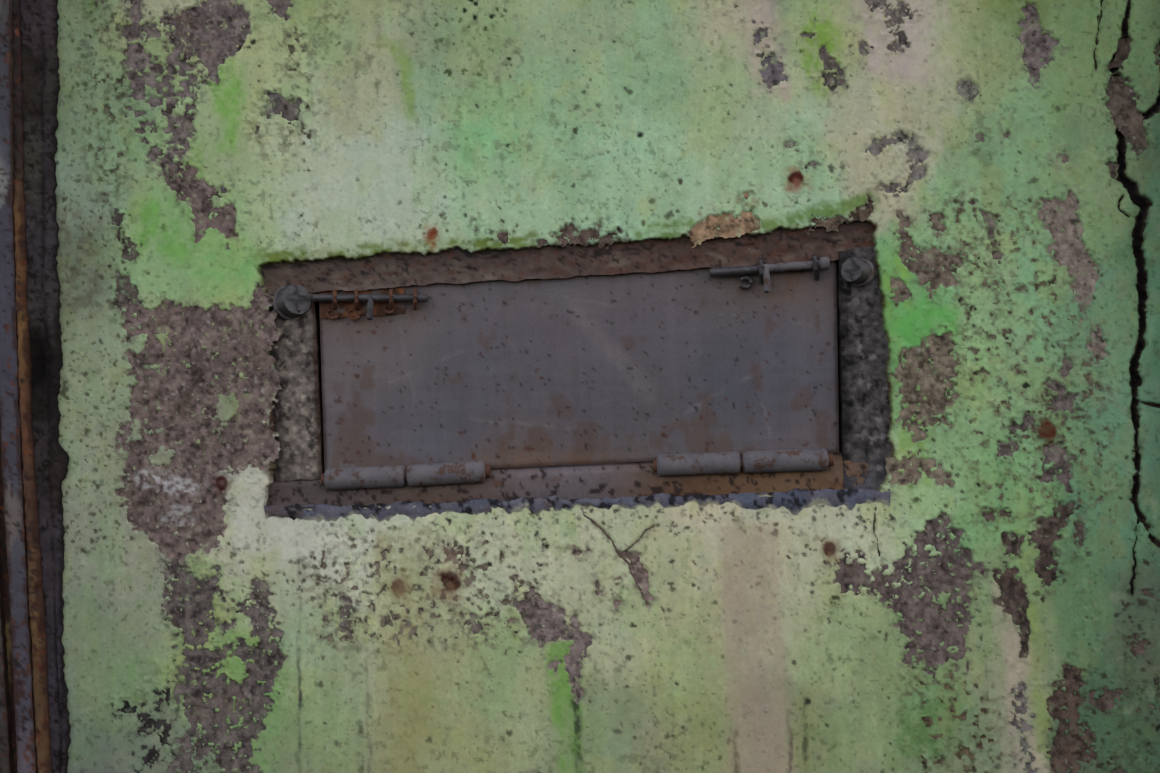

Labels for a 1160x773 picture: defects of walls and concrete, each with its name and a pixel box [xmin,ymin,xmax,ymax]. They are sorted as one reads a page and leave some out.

peeling [752,21,788,89]
peeling [800,19,848,92]
peeling [865,0,915,53]
peeling [1017,3,1059,89]
crack [1094,0,1131,81]
peeling [89,0,252,250]
peeling [252,90,311,144]
crack [1116,43,1160,594]
peeling [111,209,288,773]
peeling [805,131,1107,773]
peeling [299,541,592,703]
peeling [614,551,653,608]